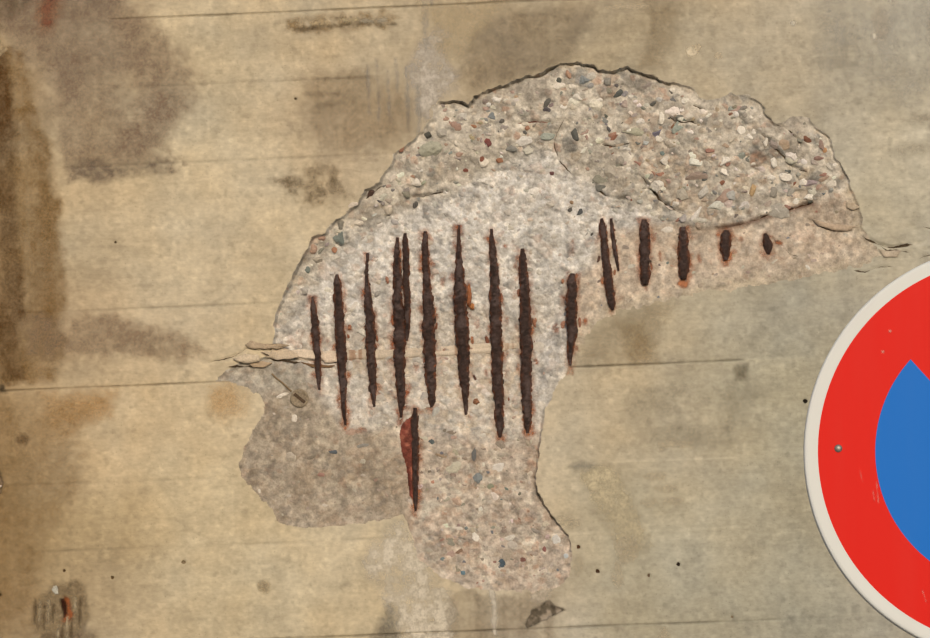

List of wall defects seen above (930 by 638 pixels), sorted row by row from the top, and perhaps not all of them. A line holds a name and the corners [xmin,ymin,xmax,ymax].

leakage [0,48,61,319]
leakage [0,0,182,181]
leakage [33,288,188,357]
corrosion [333,274,352,430]
corrosion [361,253,378,407]
corrosion [385,231,438,516]
corrosion [453,225,480,415]
corrosion [485,229,510,441]
corrosion [517,248,538,436]
spalling [216,61,901,593]
crack [854,238,930,273]
peeling [526,601,564,628]